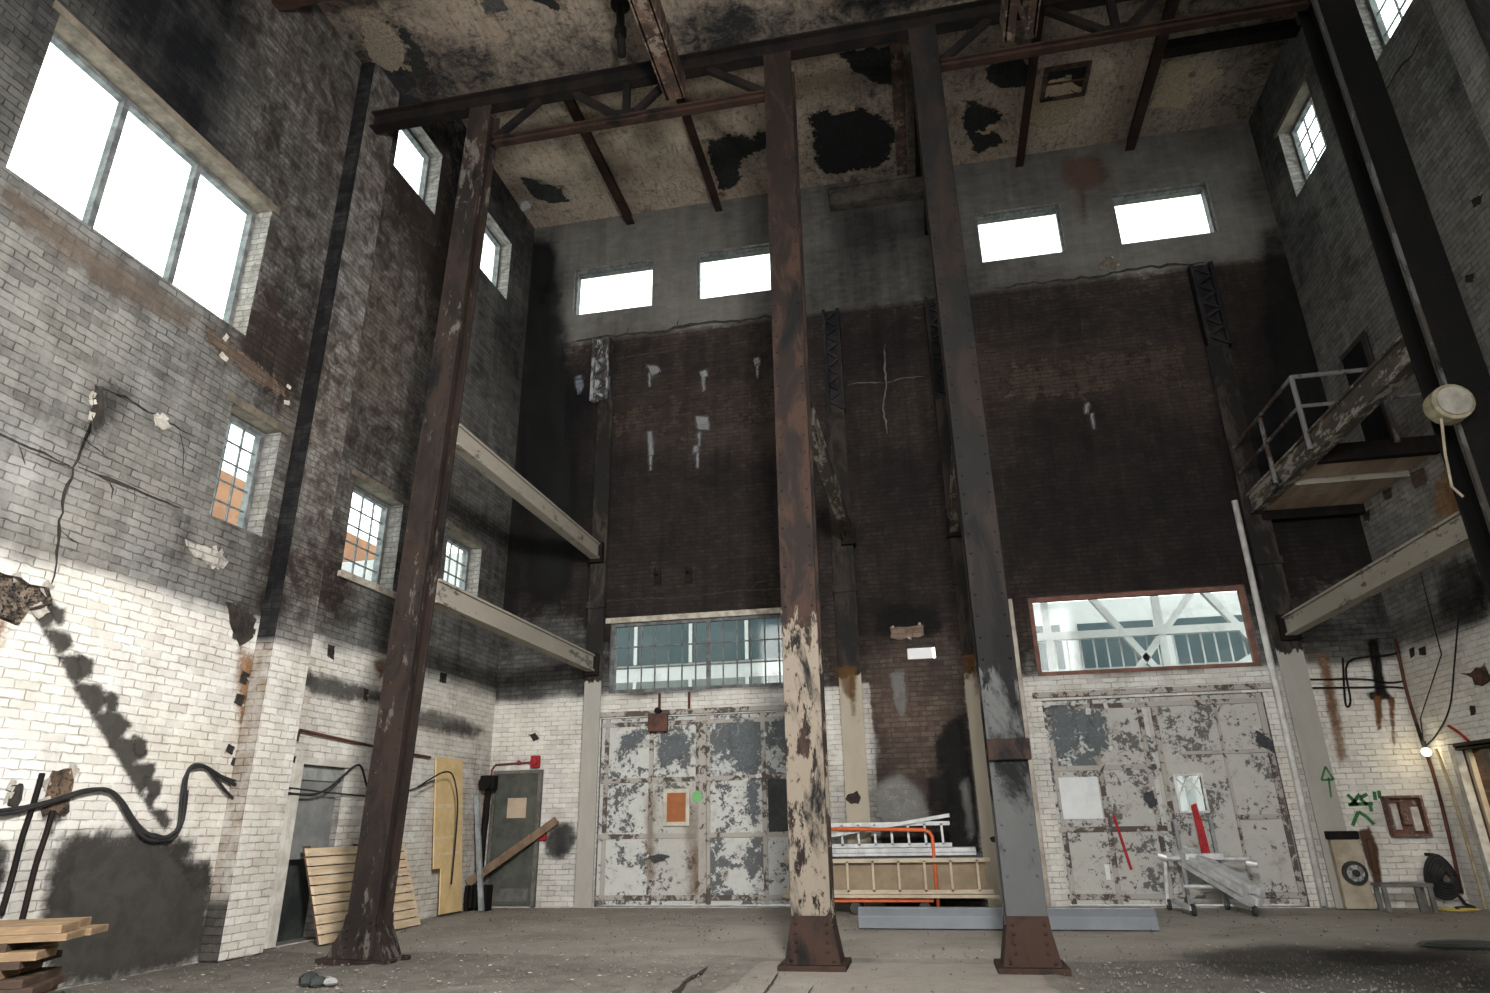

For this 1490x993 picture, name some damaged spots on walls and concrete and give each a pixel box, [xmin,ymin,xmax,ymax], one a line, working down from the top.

spalling [837,46,892,89]
spalling [701,131,766,197]
spalling [807,102,895,175]
crack [0,389,194,584]
spalling [0,571,55,625]
peeling [616,724,696,776]
peeling [724,713,786,833]
peeling [1043,700,1114,762]
peeling [1143,787,1158,813]
peeling [646,852,670,863]
crack [669,966,708,993]